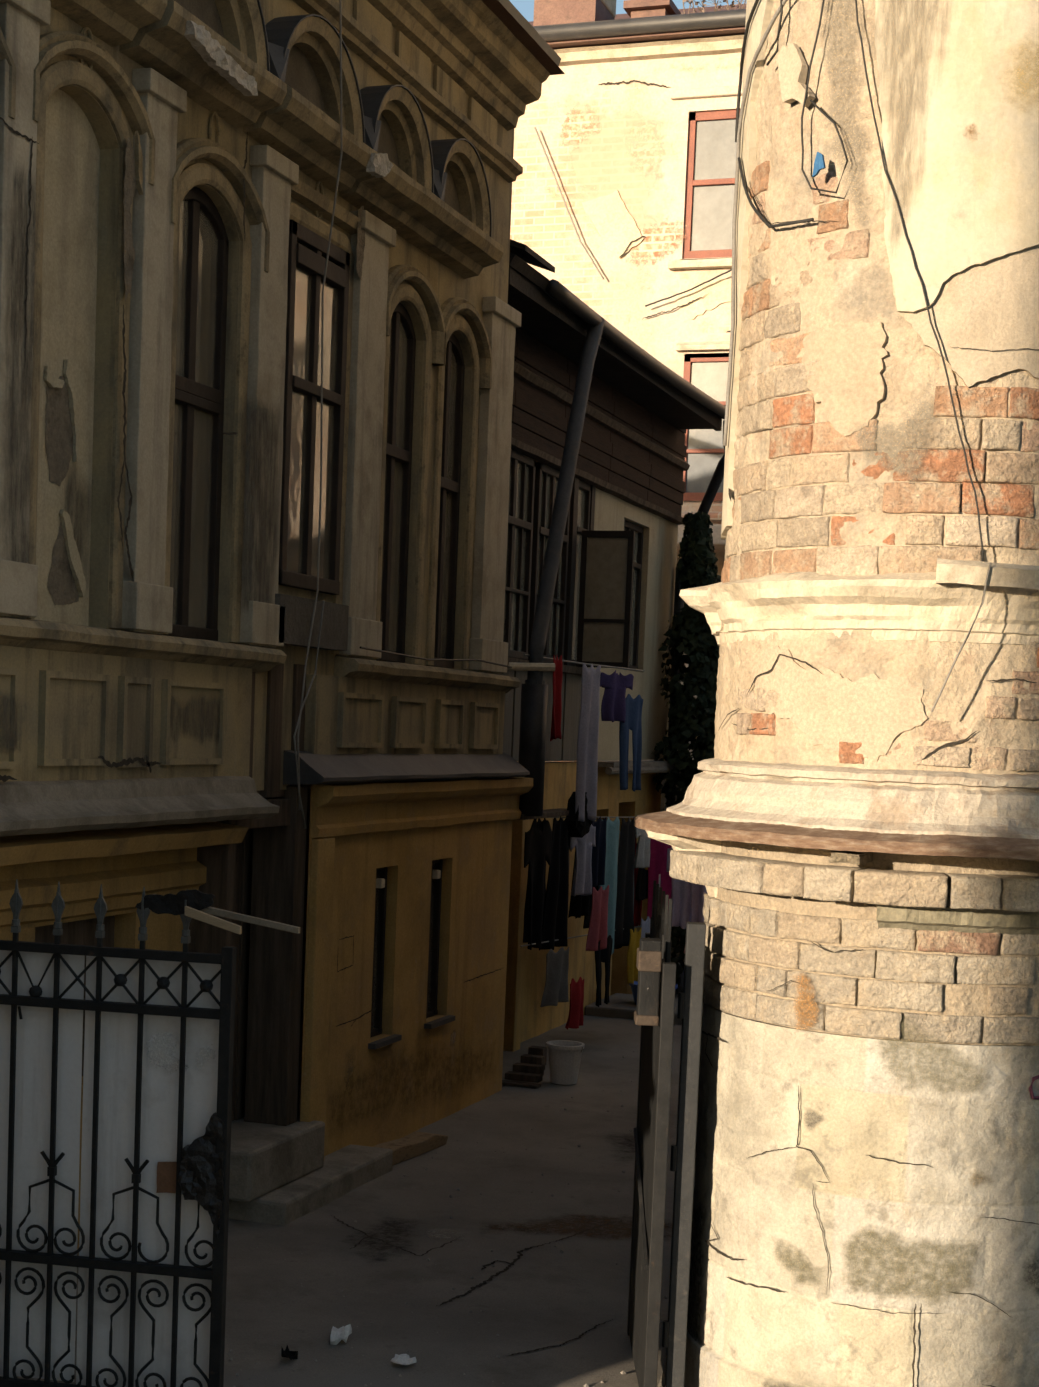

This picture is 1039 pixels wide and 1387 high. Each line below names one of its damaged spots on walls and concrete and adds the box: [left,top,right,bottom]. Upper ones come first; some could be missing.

spalling [184,20,258,96]
crack [0,117,39,362]
crack [644,296,704,318]
flaking render [721,0,1039,583]
flaking render [44,359,81,486]
crack [117,305,134,582]
flaking render [47,510,86,605]
crack [718,654,824,731]
crack [987,676,1036,684]
crack [922,730,978,760]
crack [705,1222,785,1293]
crack [748,1085,1010,1387]